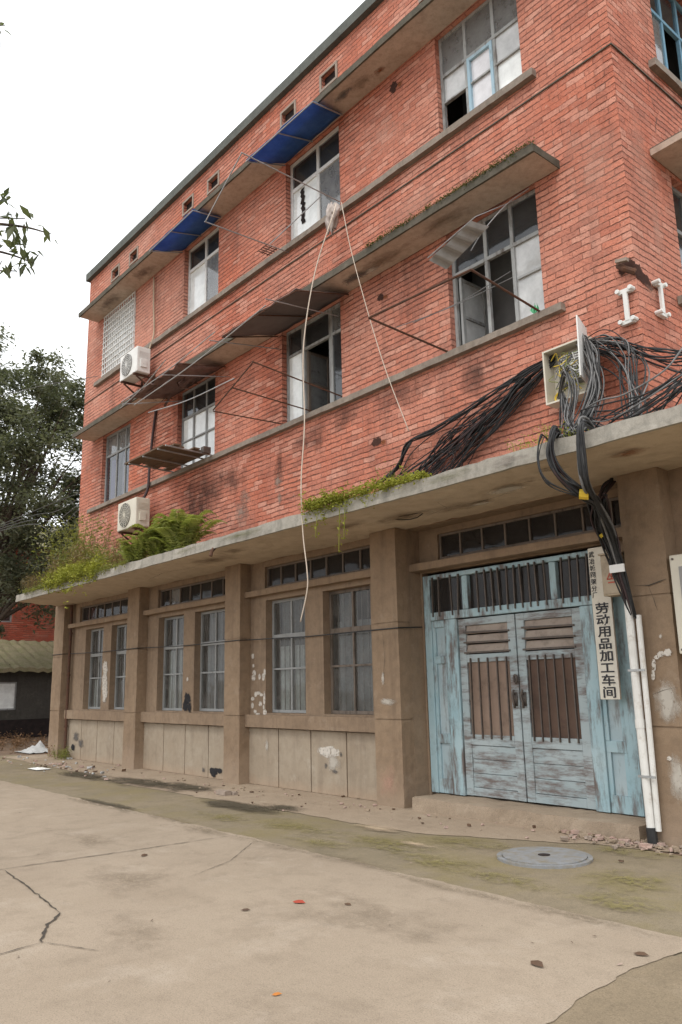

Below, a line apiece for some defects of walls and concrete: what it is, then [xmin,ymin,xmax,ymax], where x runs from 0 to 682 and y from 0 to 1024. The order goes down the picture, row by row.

peeling [651,635,671,680]
peeling [251,654,267,715]
crack [5,870,59,912]